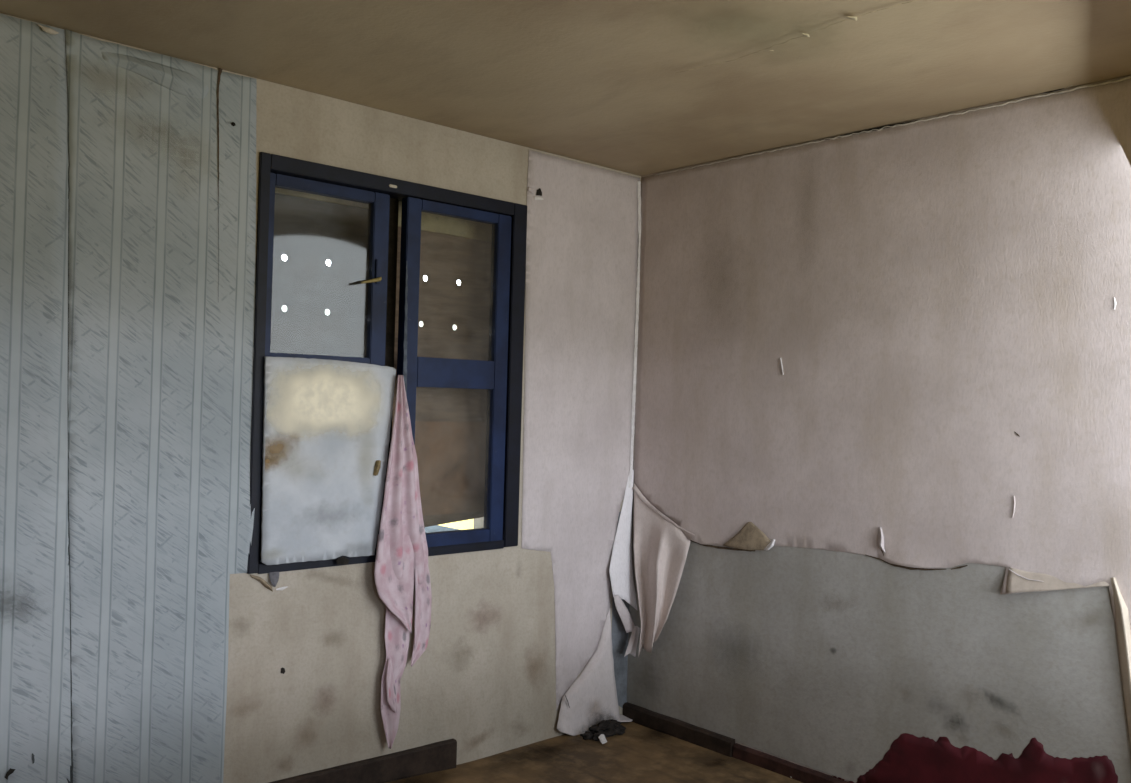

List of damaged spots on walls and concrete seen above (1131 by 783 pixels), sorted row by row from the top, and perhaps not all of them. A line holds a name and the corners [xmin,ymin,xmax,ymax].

crack [63,37,71,363]
crack [216,68,224,286]
crack [66,410,74,783]
peeling [612,457,1131,783]